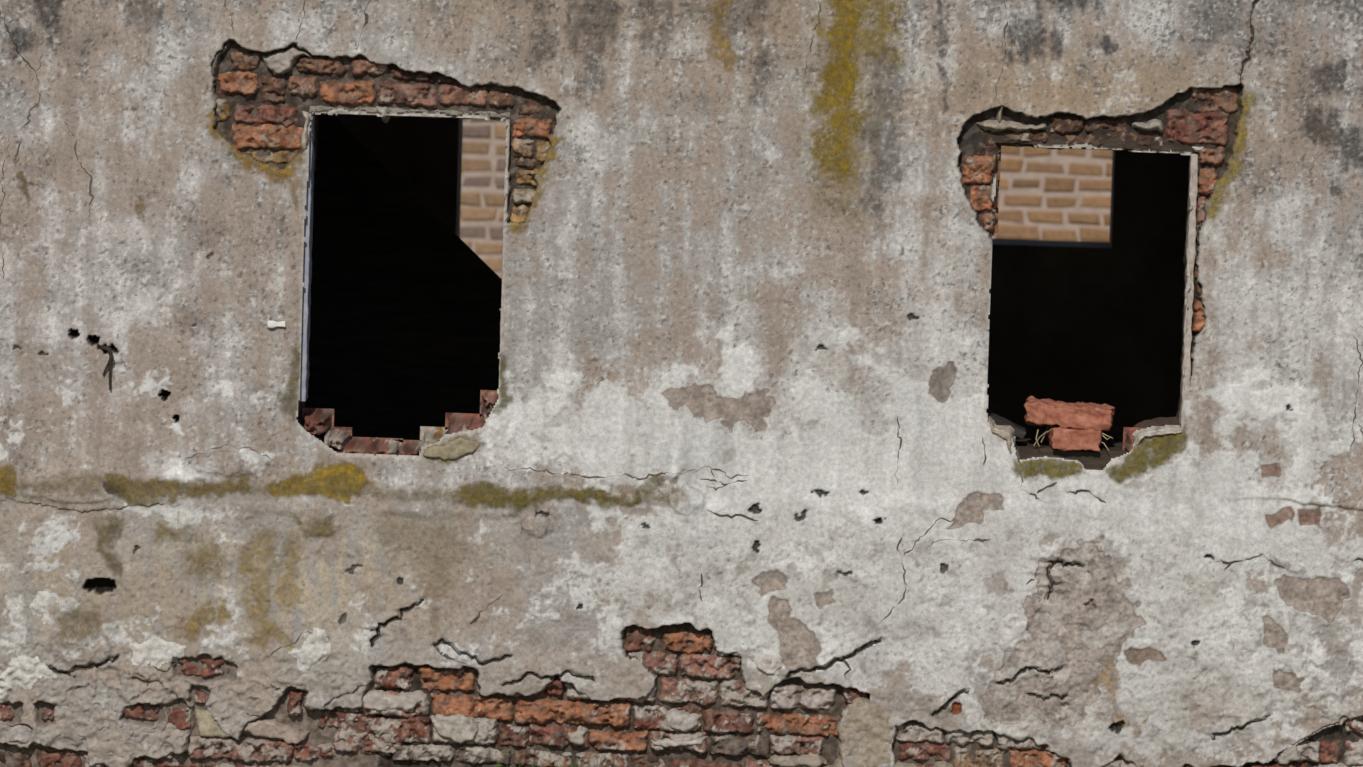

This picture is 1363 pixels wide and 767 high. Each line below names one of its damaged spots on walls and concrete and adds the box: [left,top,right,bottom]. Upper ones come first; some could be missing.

crack [0,11,42,278]
crack [65,122,94,225]
flaking render [212,27,559,223]
water stain [818,0,900,176]
crack [1240,0,1260,87]
flaking render [958,84,1243,376]
flaking render [0,535,1166,767]
peeling [1263,616,1288,653]
peeling [1273,669,1304,692]
peeling [1274,574,1350,622]
flaking render [1212,716,1363,767]